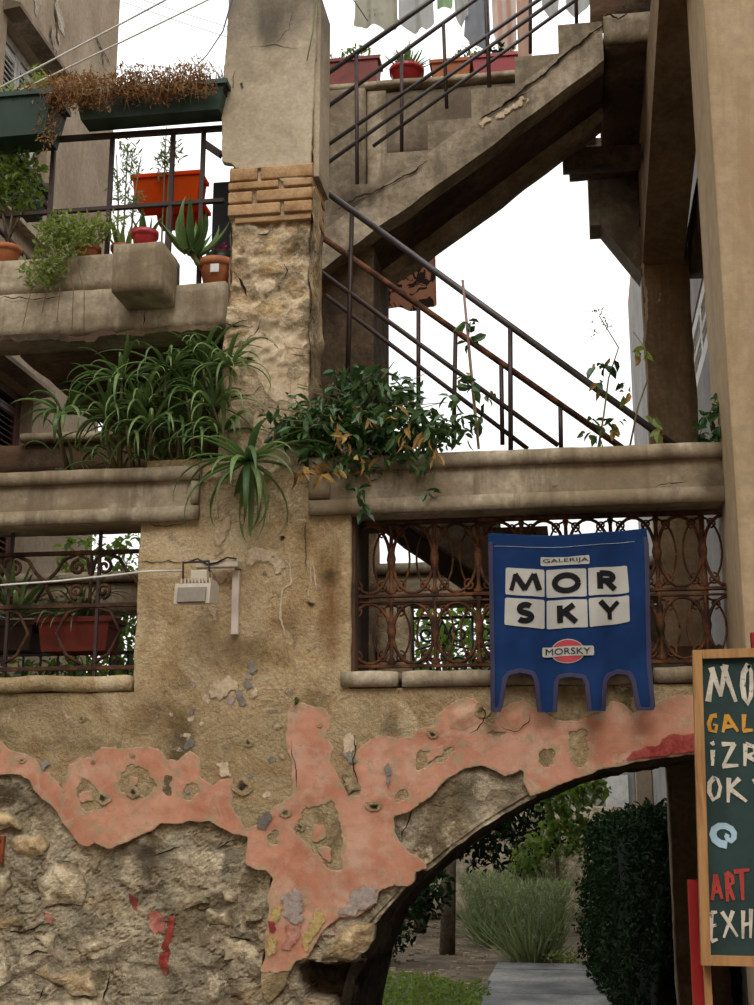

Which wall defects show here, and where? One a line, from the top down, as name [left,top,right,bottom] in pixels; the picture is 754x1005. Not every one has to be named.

crack [480,11,629,119]
spalling [479,96,529,127]
crack [336,161,427,210]
spalling [191,661,258,720]
spalling [0,687,695,1005]